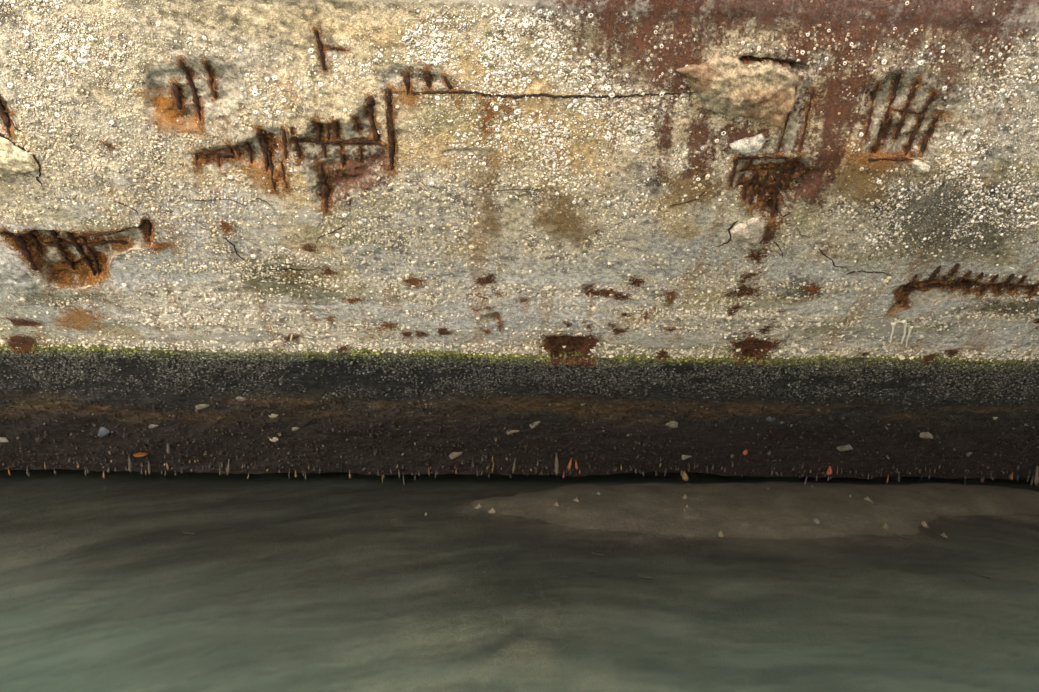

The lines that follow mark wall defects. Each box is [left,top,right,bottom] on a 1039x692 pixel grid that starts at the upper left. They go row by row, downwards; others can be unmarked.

spalling [140,54,248,131]
spalling [184,64,455,220]
crack [400,85,696,99]
spalling [726,56,825,230]
spalling [857,68,969,169]
corrosion [2,307,107,355]
spalling [0,212,160,291]
corrosion [375,321,454,340]
corrosion [471,270,504,334]
corrosion [539,275,652,368]
corrosion [729,309,787,367]
spalling [887,263,1039,314]